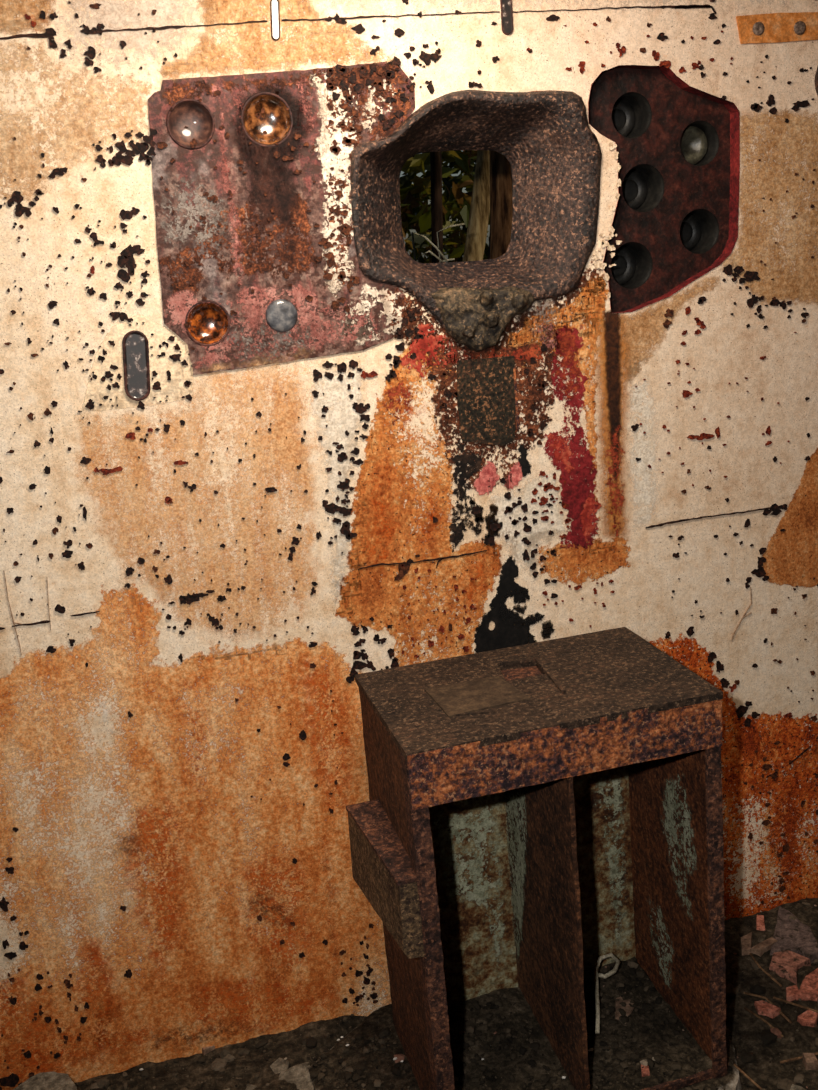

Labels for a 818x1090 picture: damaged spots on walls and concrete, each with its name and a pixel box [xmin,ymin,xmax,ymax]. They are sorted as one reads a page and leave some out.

crack [0,4,716,40]
peeling [640,23,714,78]
peeling [746,55,814,123]
peeling [0,153,68,257]
rust [158,59,412,298]
peeling [25,0,615,684]
peeling [722,260,809,333]
rust [335,261,631,667]
crack [358,550,487,570]
crack [646,506,785,528]
rust [649,633,818,920]
rust [0,584,392,1090]